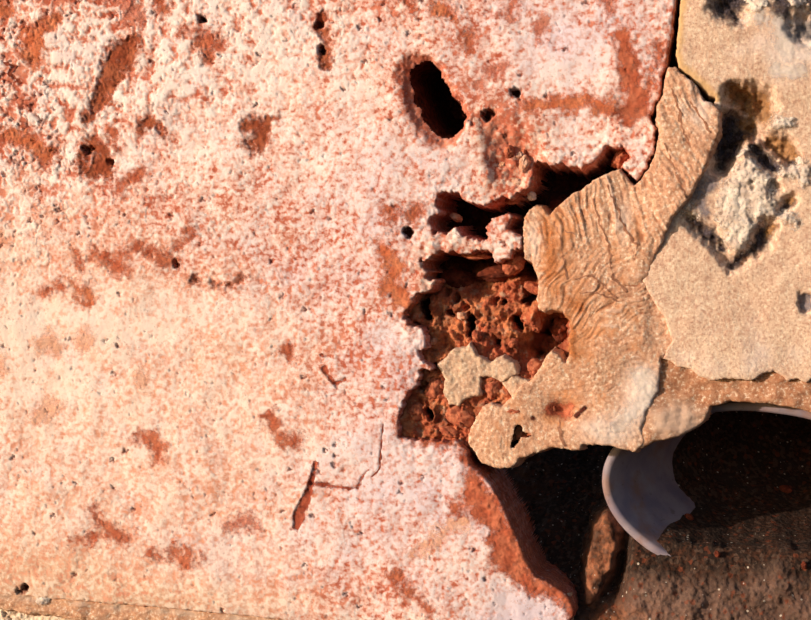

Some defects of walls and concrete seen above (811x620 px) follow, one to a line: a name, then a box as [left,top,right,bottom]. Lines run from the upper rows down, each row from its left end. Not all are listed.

crack [669,0,681,69]
damp [710,0,811,79]
crack [671,88,711,141]
peeling [379,198,427,228]
spalling [446,145,630,238]
crack [553,184,640,302]
crack [664,143,690,200]
damp [681,83,811,270]
spalling [375,239,578,618]
efflorescence [611,367,658,432]